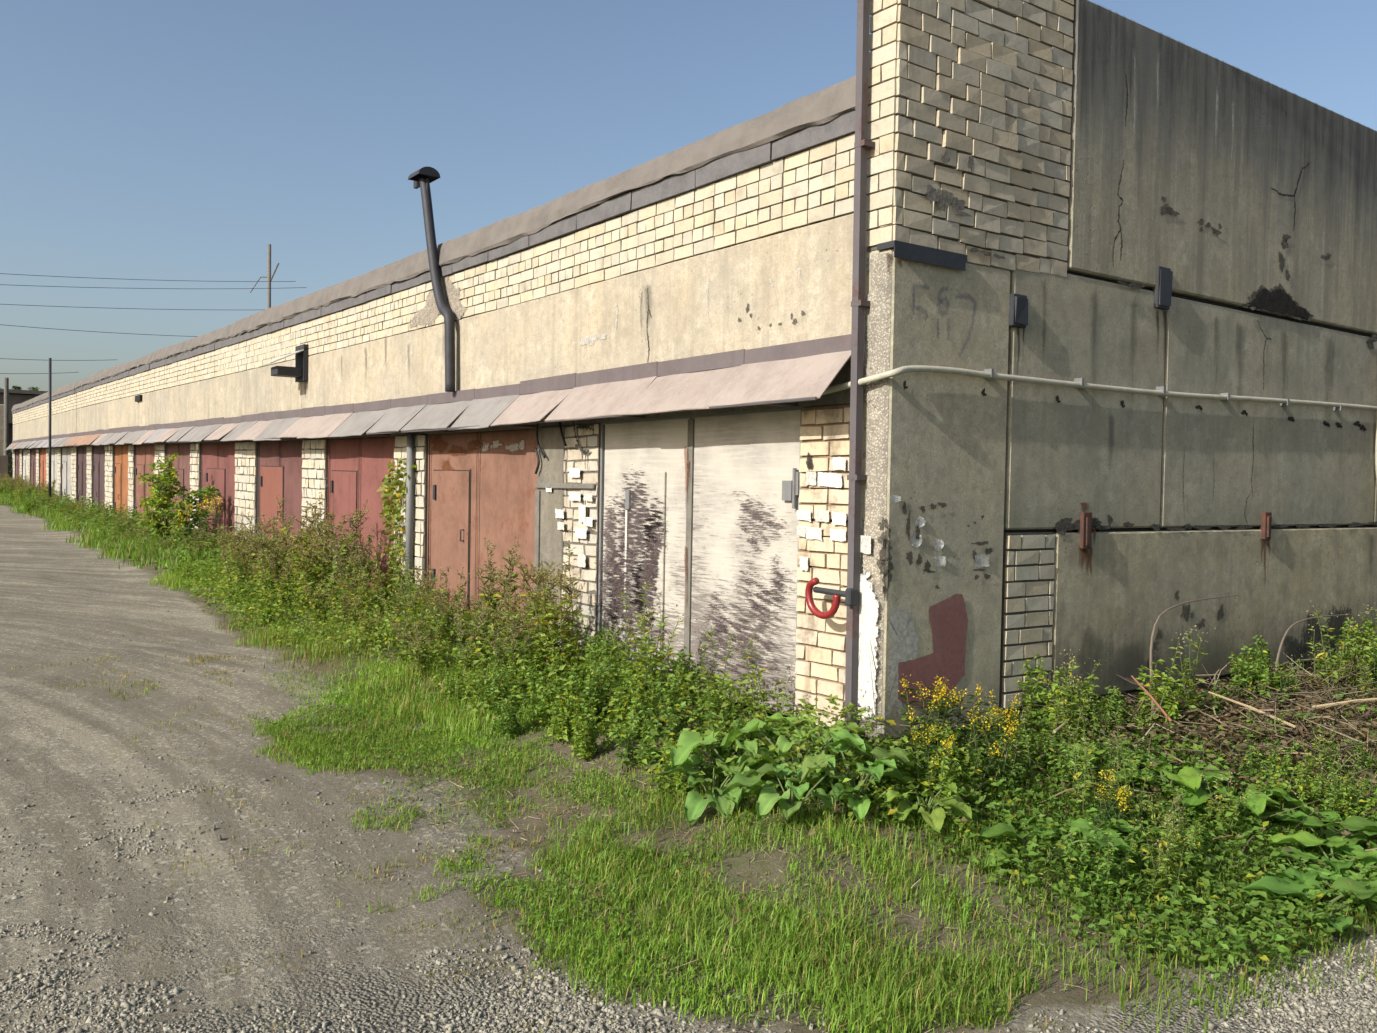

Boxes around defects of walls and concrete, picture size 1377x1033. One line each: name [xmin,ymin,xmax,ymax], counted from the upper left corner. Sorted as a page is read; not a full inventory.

crack [1112,160,1124,266]
crack [1271,162,1309,231]
spalling [1242,234,1313,321]
peeling [967,515,993,580]